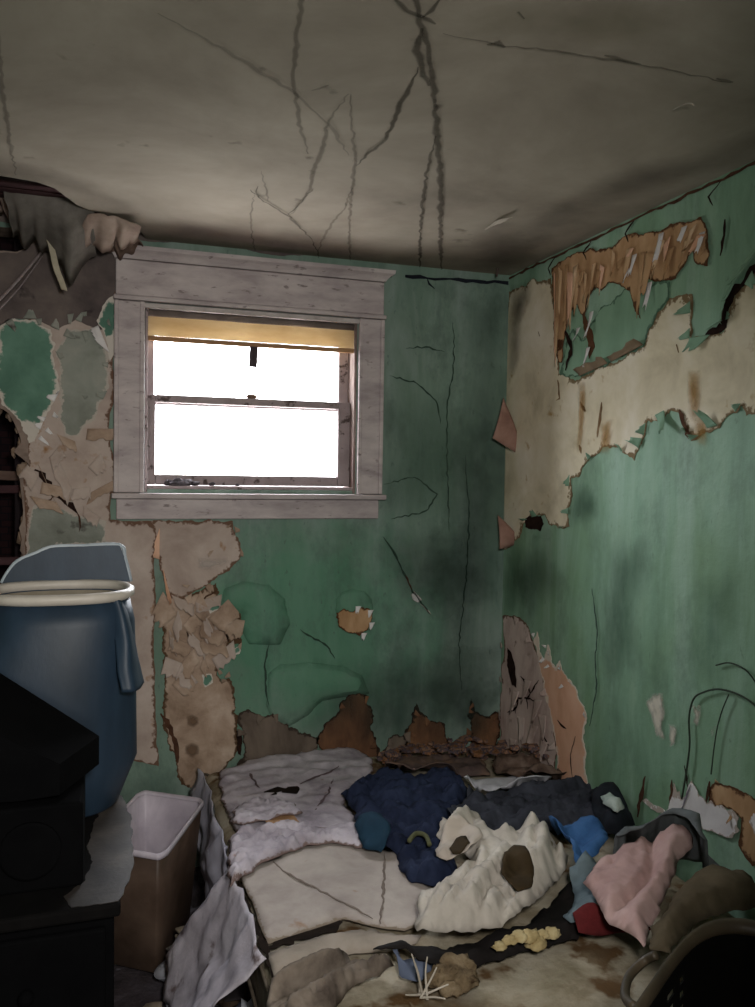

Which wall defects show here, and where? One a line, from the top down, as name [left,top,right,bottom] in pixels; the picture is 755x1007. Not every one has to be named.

spalling [0,237,36,253]
peeling [652,232,664,262]
peeling [499,249,755,550]
peeling [0,290,245,788]
crack [383,324,470,690]
peeling [499,615,588,784]
peeling [642,780,755,866]